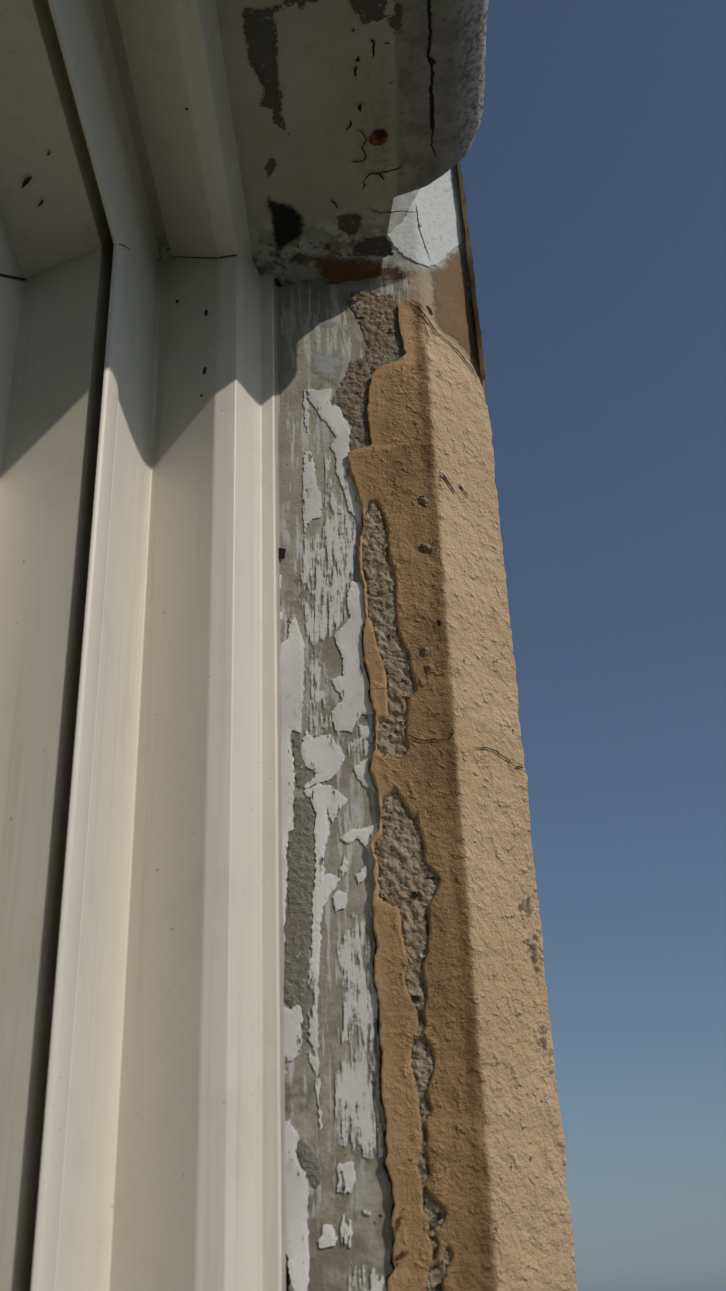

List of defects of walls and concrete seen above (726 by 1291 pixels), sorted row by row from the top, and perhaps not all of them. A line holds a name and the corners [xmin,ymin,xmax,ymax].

peeling [242,0,318,135]
peeling [349,0,403,33]
corrosion [369,129,388,146]
crack [330,40,430,259]
crack [426,0,437,158]
flaking render [336,214,395,257]
flaking render [280,291,452,1291]